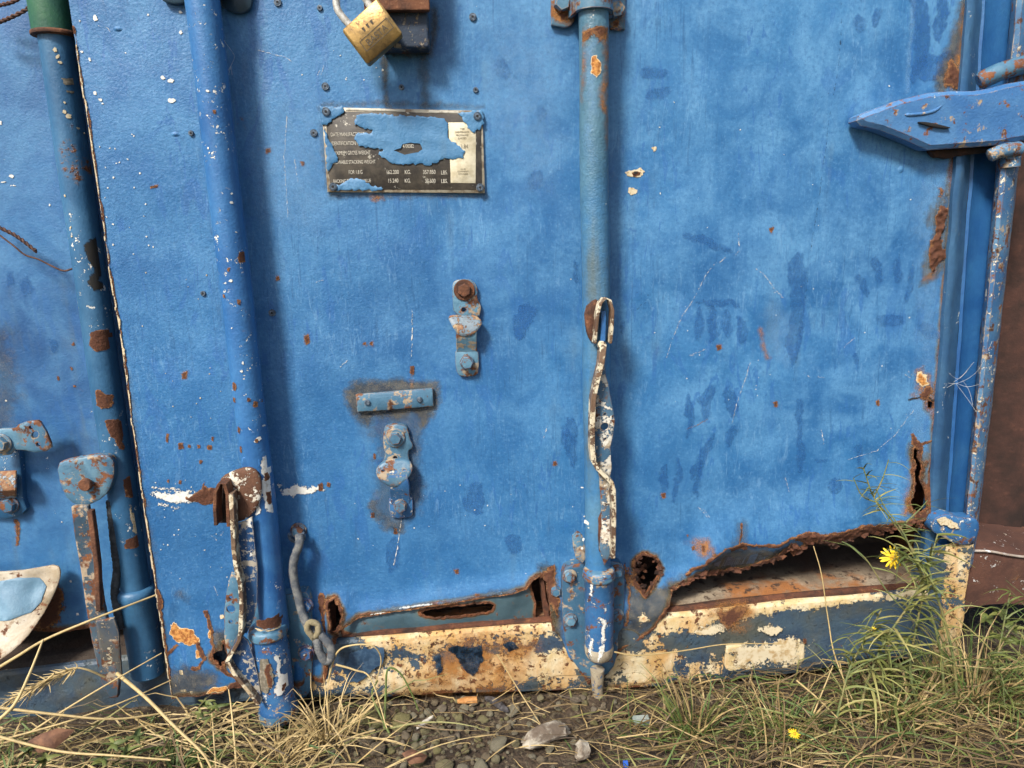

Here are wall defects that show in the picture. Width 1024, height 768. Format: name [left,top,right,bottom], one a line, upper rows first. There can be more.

peeling [319,106,465,171]
peeling [336,178,383,192]
corrosion [923,188,949,300]
corrosion [72,25,200,699]
corrosion [911,433,932,459]
corrosion [185,484,215,505]
corrosion [670,498,929,592]
corrosion [624,555,665,627]
peeling [588,618,607,662]
peeling [692,622,730,637]
peeling [757,623,785,636]
peeling [343,646,384,683]